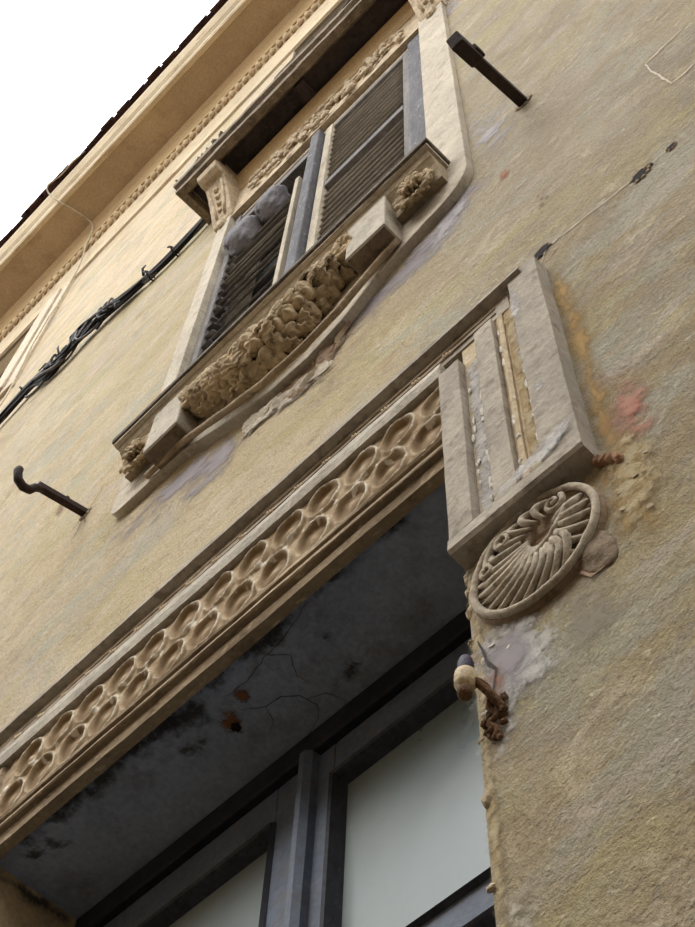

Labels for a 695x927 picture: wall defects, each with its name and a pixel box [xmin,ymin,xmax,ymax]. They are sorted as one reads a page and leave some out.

spalling [241,321,358,437]
peeling [591,433,667,522]
water stain [46,702,209,822]
rust [220,712,242,733]
crack [226,606,345,734]
rust [480,691,509,741]
peeling [464,573,556,927]